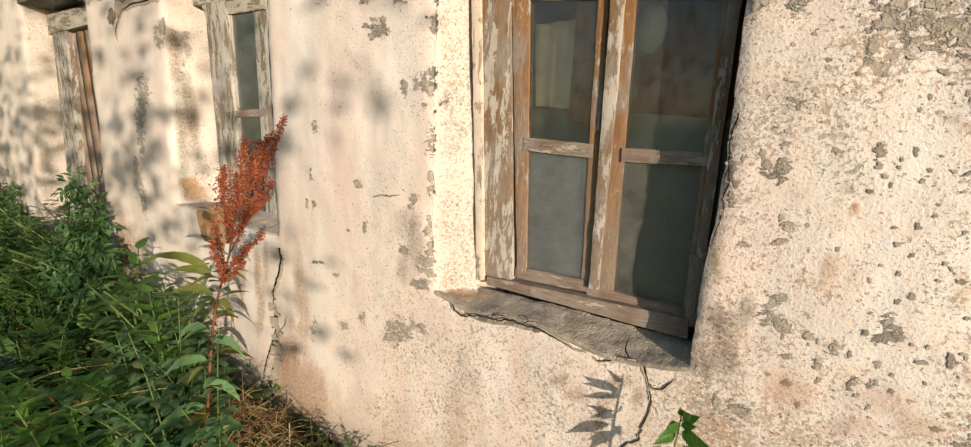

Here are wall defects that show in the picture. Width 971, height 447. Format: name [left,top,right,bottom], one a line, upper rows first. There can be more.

crack [115,0,159,41]
peeling [362,15,391,41]
peeling [424,0,441,35]
peeling [856,0,971,76]
peeling [132,73,152,216]
crack [709,113,741,248]
peeling [873,142,920,189]
crack [262,247,287,408]
peeling [756,288,853,384]
peeling [862,292,916,347]
crack [452,304,676,447]
peeling [844,361,883,398]